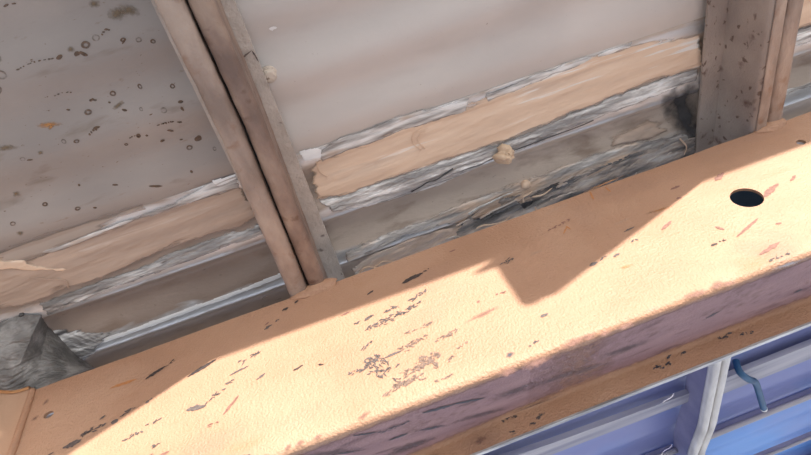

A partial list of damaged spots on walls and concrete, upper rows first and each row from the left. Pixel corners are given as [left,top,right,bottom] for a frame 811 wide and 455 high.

rust [16,41,90,70]
peeling [354,289,427,330]
peeling [348,321,468,397]
peeling [186,350,260,411]
peeling [63,407,136,449]